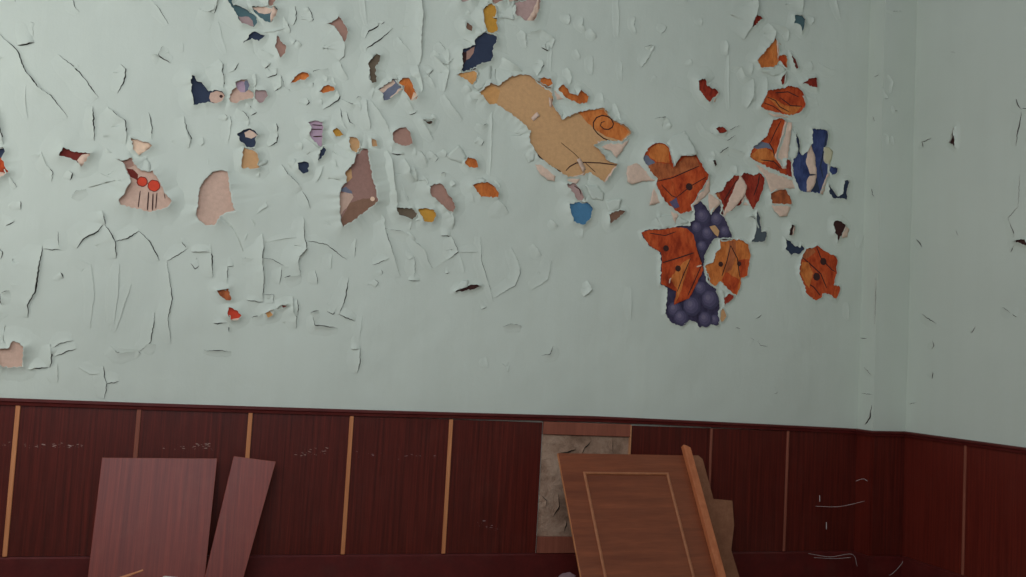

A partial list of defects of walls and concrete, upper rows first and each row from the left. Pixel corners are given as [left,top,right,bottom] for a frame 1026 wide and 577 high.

peeling [0,0,853,336]
crack [1010,99,1026,147]
peeling [0,244,53,382]
flaking render [537,434,629,536]